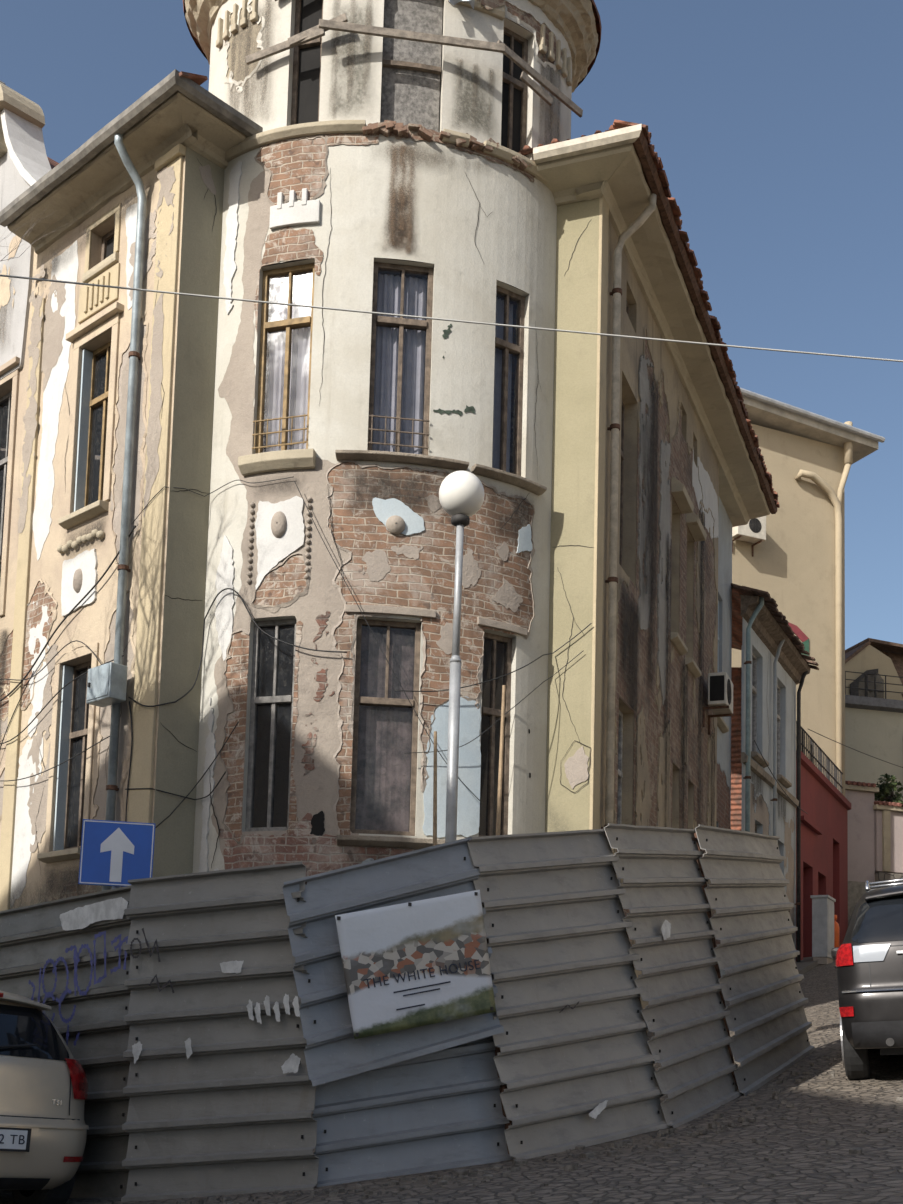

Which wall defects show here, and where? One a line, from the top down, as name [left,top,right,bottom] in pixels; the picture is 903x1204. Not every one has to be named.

water stain [336,11,372,108]
flaking render [254,227,323,332]
flaking render [223,120,535,315]
flaking render [199,460,535,877]
flaking render [614,327,796,942]